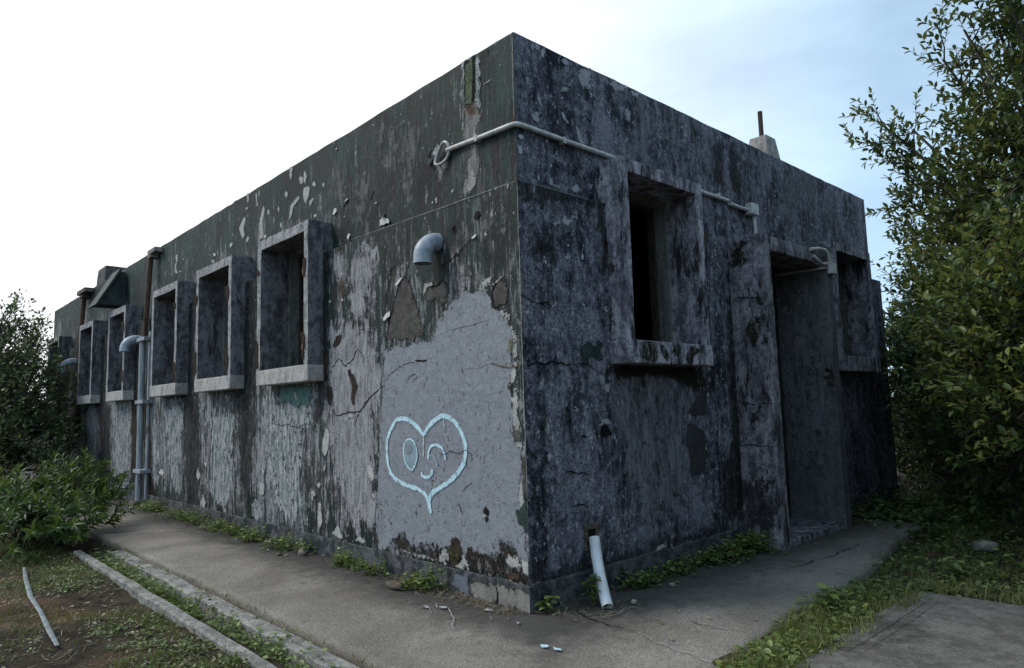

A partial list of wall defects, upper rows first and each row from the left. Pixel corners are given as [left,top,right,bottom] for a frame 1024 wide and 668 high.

damp [459,102,482,196]
peeling [230,166,324,248]
damp [518,179,608,274]
damp [182,302,203,505]
damp [234,278,258,517]
peeling [251,334,342,531]
spalling [348,369,358,406]
crack [332,360,426,424]
peeling [479,275,522,450]
damp [315,237,782,590]
peeling [332,526,366,544]
spalling [402,536,538,613]